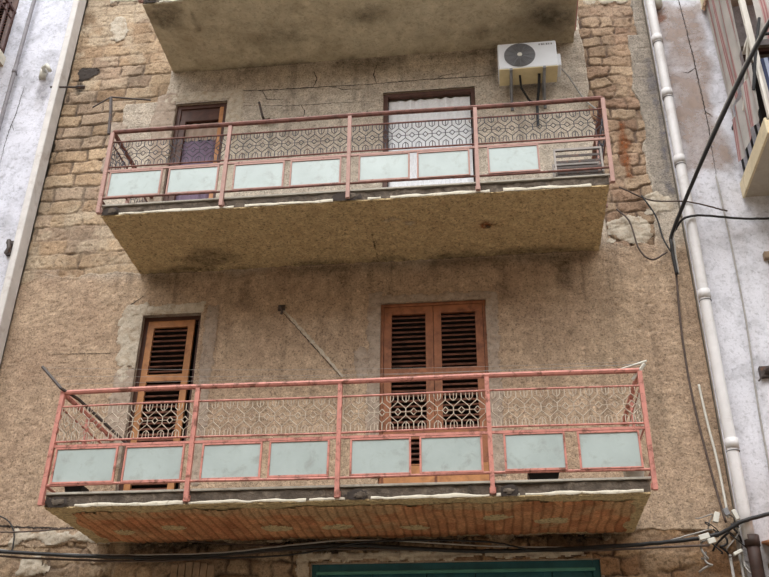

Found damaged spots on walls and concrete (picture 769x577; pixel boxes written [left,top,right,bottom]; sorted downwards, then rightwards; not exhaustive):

crack [244,65,487,116]
crack [678,0,716,170]